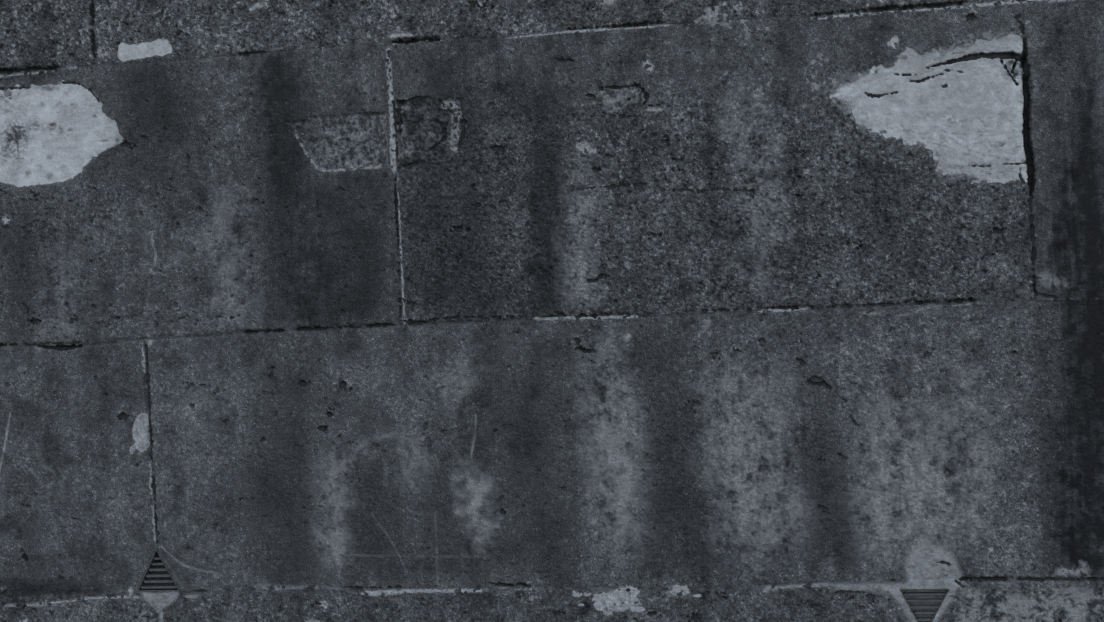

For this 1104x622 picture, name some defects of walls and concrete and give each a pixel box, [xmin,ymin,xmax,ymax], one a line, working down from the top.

spalling [285,96,466,172]
leakage [1049,76,1104,579]